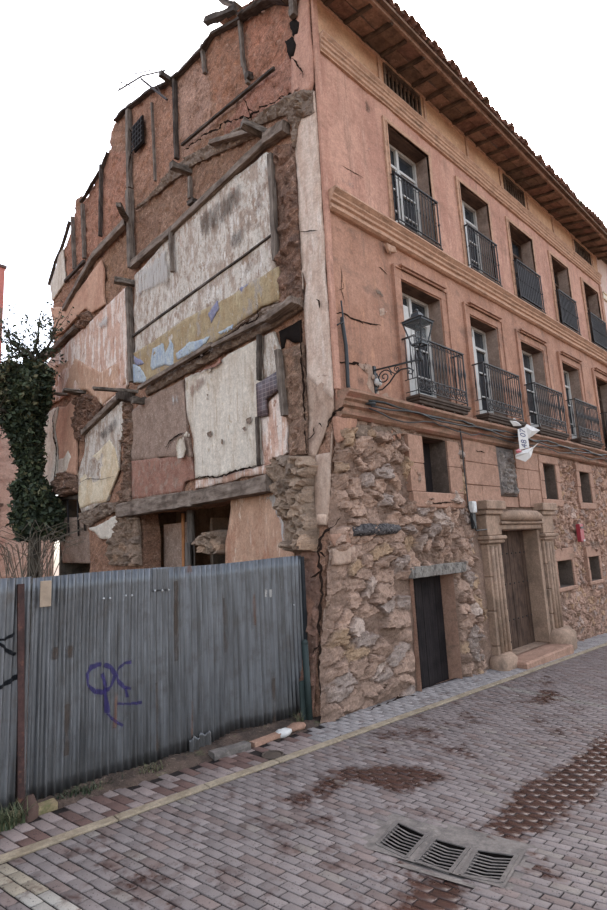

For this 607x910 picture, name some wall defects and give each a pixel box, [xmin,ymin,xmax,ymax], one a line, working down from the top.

flaking render [77,440,120,509]
crack [311,518,340,698]